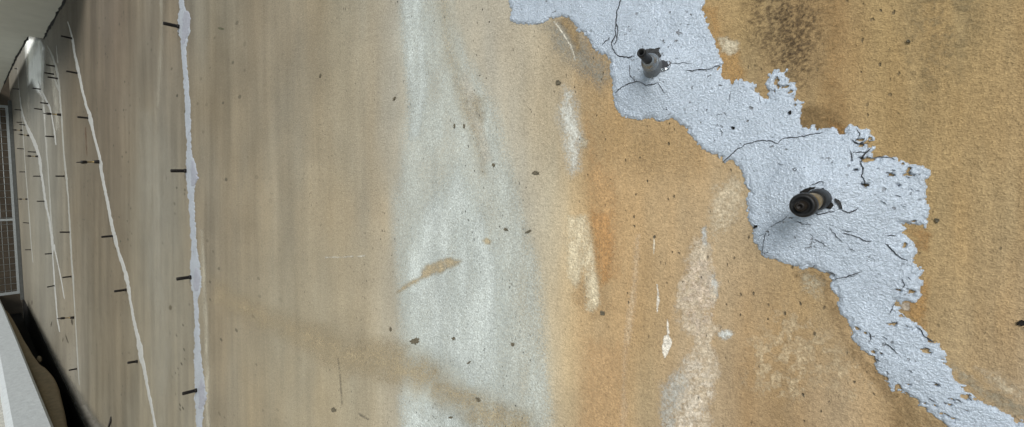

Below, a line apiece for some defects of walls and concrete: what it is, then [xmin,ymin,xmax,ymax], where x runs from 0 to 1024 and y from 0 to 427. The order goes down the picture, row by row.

damp [755,0,818,73]
damp [801,106,846,135]
crack [508,0,1024,427]